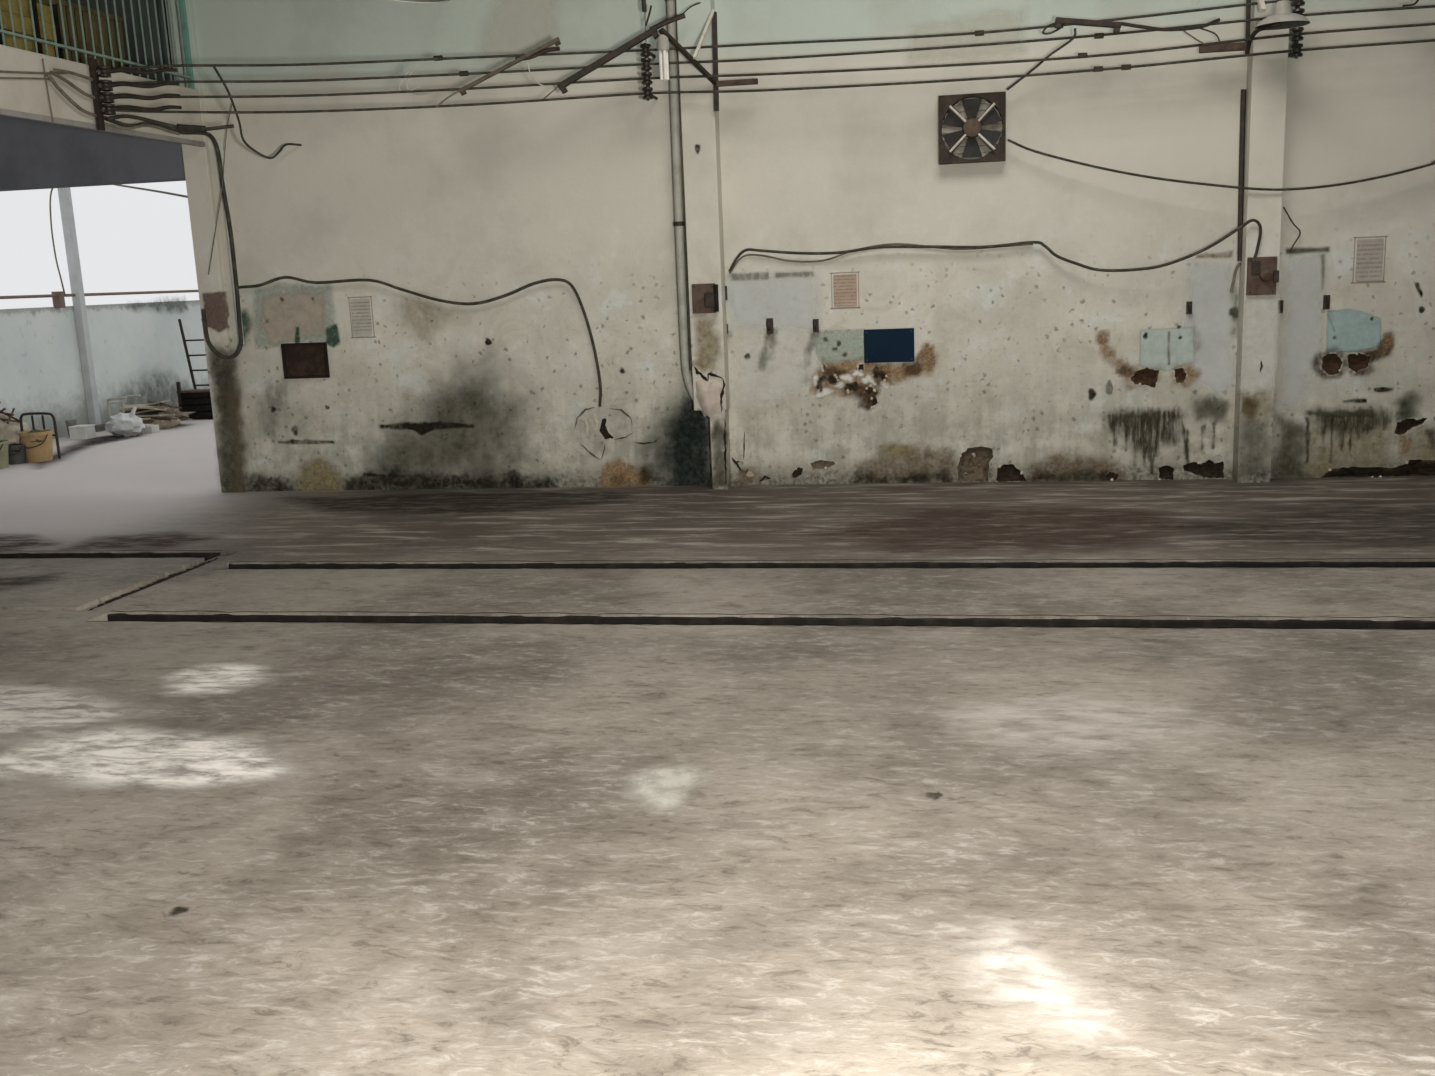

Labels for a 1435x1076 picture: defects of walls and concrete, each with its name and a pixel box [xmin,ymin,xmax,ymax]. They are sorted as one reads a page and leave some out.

spalling [813,361,889,409]
spalling [1088,367,1198,400]
spalling [1314,352,1372,377]
water stain [211,350,553,493]
water stain [654,400,727,486]
spalling [957,446,1026,482]
water stain [1034,456,1112,481]
water stain [1108,400,1227,474]
water stain [1244,399,1262,471]
water stain [1276,395,1415,478]